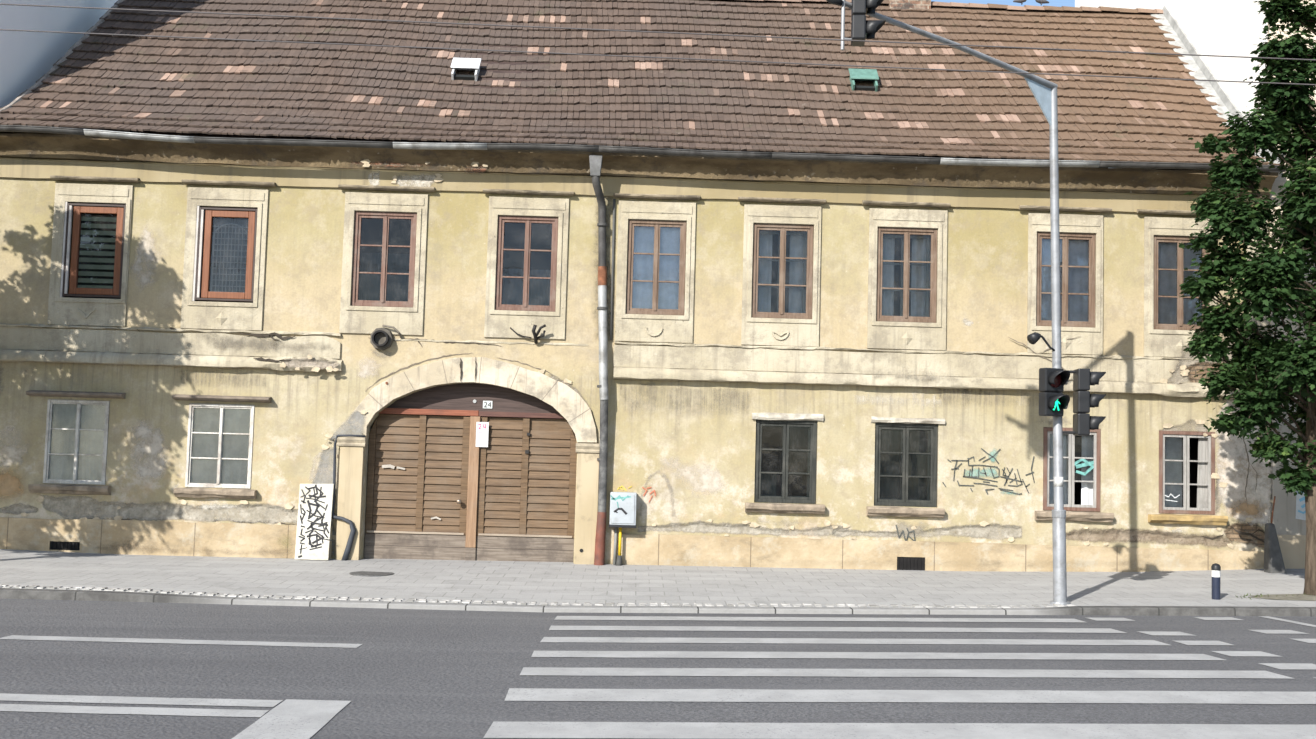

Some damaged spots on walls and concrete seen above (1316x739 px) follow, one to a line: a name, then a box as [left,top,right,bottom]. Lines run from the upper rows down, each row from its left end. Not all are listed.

spalling [1160,342,1233,384]
peeling [1066,419,1276,551]
spalling [0,495,298,525]